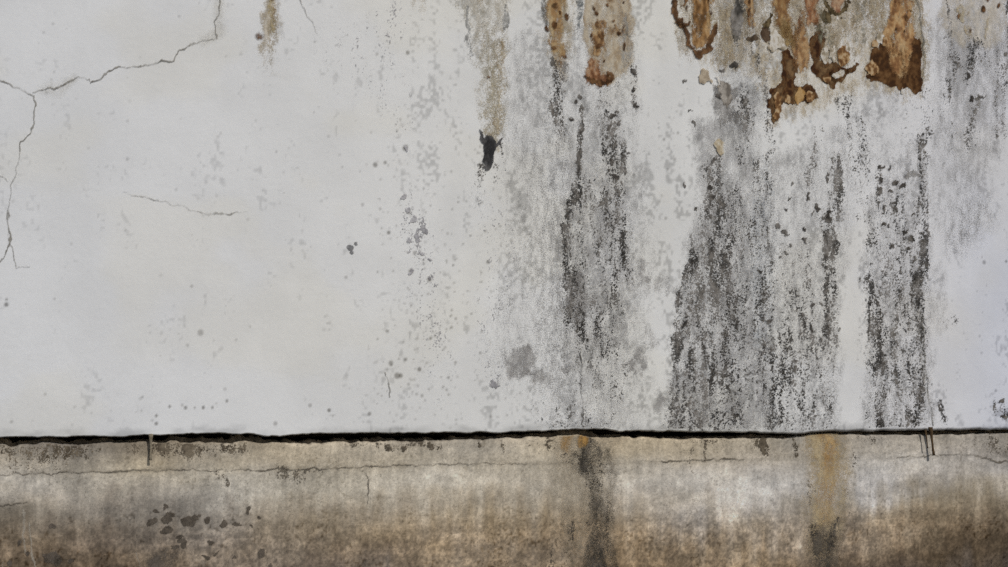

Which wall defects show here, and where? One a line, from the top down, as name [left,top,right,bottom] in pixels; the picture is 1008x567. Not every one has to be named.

crack [1,0,221,150]
rust [256,0,279,52]
rust [455,0,511,152]
rust [542,0,636,87]
rust [671,0,1007,125]
damp [475,129,506,187]
crack [0,210,16,266]
damp [400,194,437,291]
damp [654,0,1008,464]
damp [531,56,659,567]
damp [126,441,247,459]
damp [147,504,261,567]